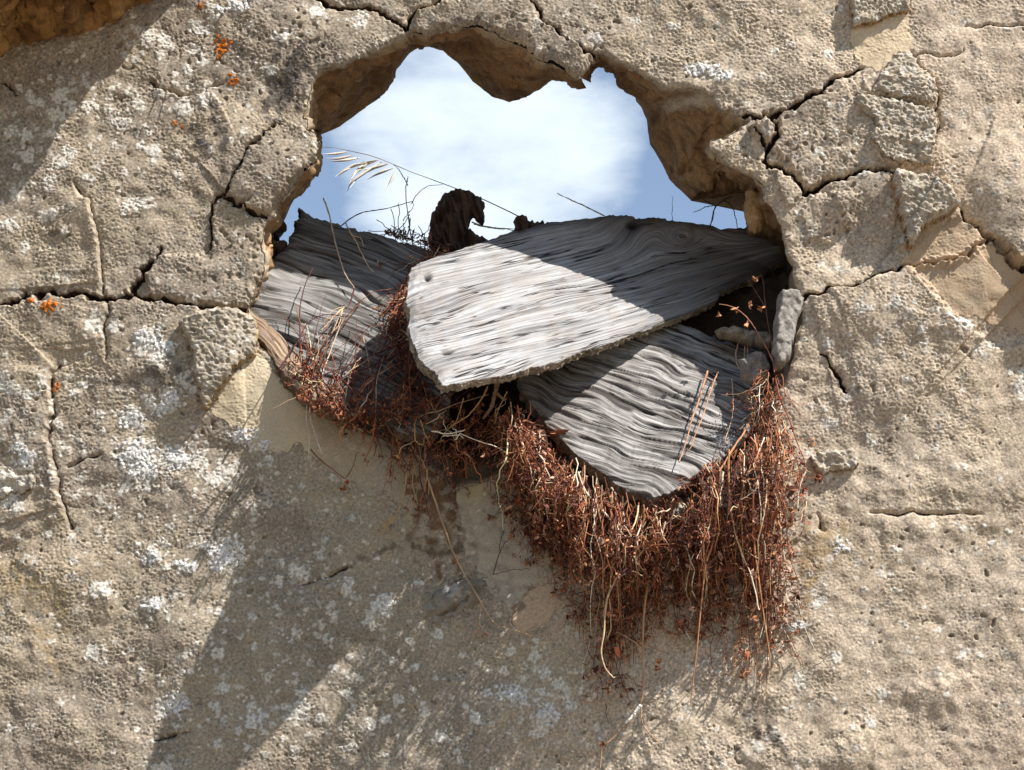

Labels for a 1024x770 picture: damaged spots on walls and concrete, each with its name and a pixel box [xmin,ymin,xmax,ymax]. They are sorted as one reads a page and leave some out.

crack [1,182,249,359]
crack [209,123,281,251]
crack [742,68,894,197]
crack [803,266,902,302]
crack [960,210,1024,274]
crack [819,354,847,394]
crack [48,364,100,529]
crack [870,510,979,518]